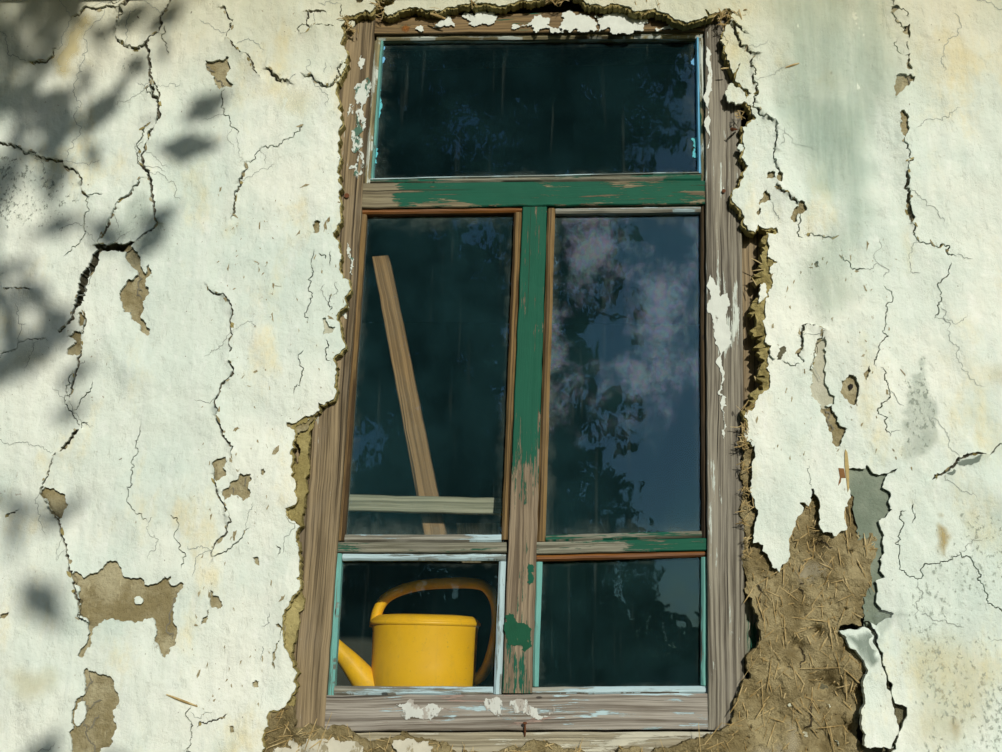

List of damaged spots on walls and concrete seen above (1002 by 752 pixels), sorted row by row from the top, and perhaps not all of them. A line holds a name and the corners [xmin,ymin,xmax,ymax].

crack [201,6,343,105]
flaking render [791,201,807,222]
crack [731,20,983,432]
crack [0,0,180,621]
flaking render [120,246,152,336]
crack [194,286,256,449]
flaking render [804,337,873,451]
crack [926,415,1000,501]
flaking render [72,561,184,657]
flaking render [194,584,234,626]
flaking render [70,668,119,752]
crack [864,621,898,752]